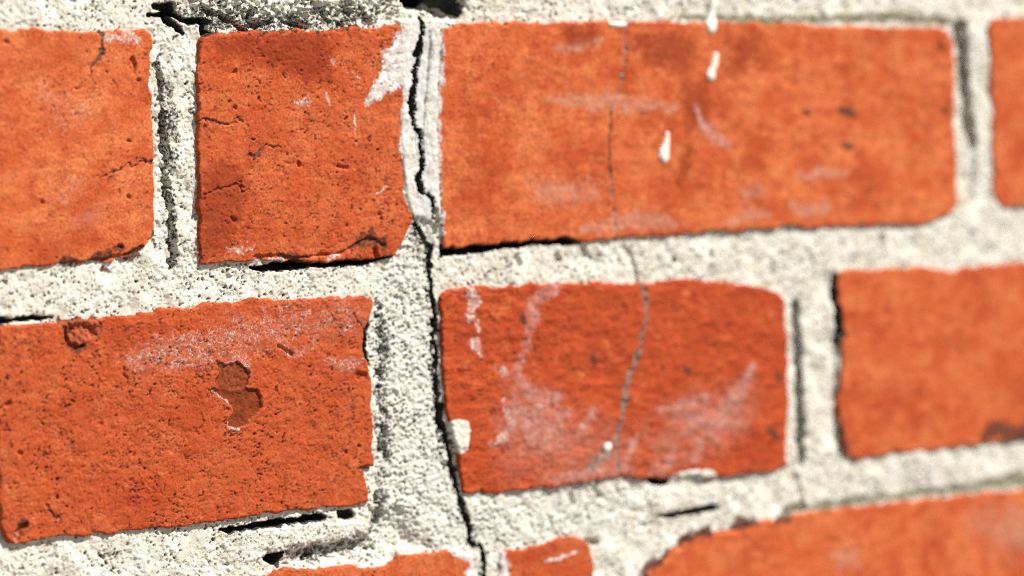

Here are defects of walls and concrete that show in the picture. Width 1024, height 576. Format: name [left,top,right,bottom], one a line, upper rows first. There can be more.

crack [594,20,650,476]
peeling [56,316,103,354]
crack [406,16,487,576]
efflorescence [465,283,482,357]
spalling [210,361,261,431]
efflorescence [489,374,559,445]